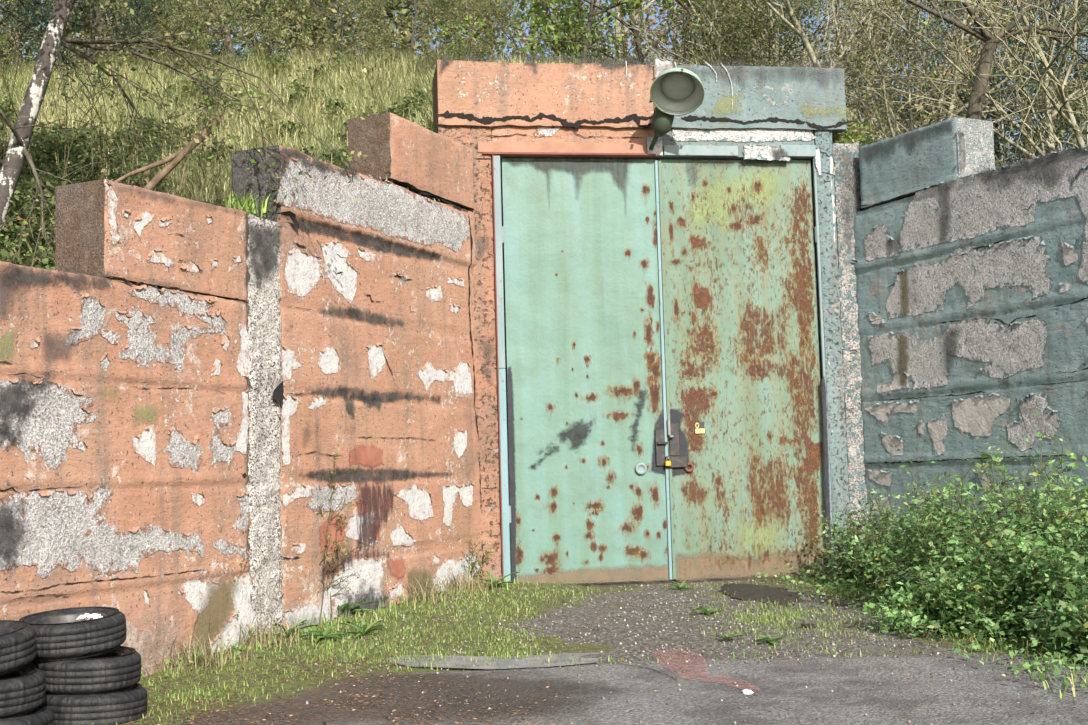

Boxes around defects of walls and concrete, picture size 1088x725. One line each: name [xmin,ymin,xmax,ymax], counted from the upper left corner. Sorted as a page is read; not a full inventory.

crack [436,110,653,159]
crack [681,115,854,129]
spalling [862,128,1088,456]
peeling [0,374,98,472]
peeling [65,279,251,473]
peeling [417,362,473,397]
rust [610,285,661,413]
rust [646,180,822,569]
peeling [0,484,255,654]
rust [536,534,568,574]
rust [573,502,607,563]
rust [622,485,658,532]